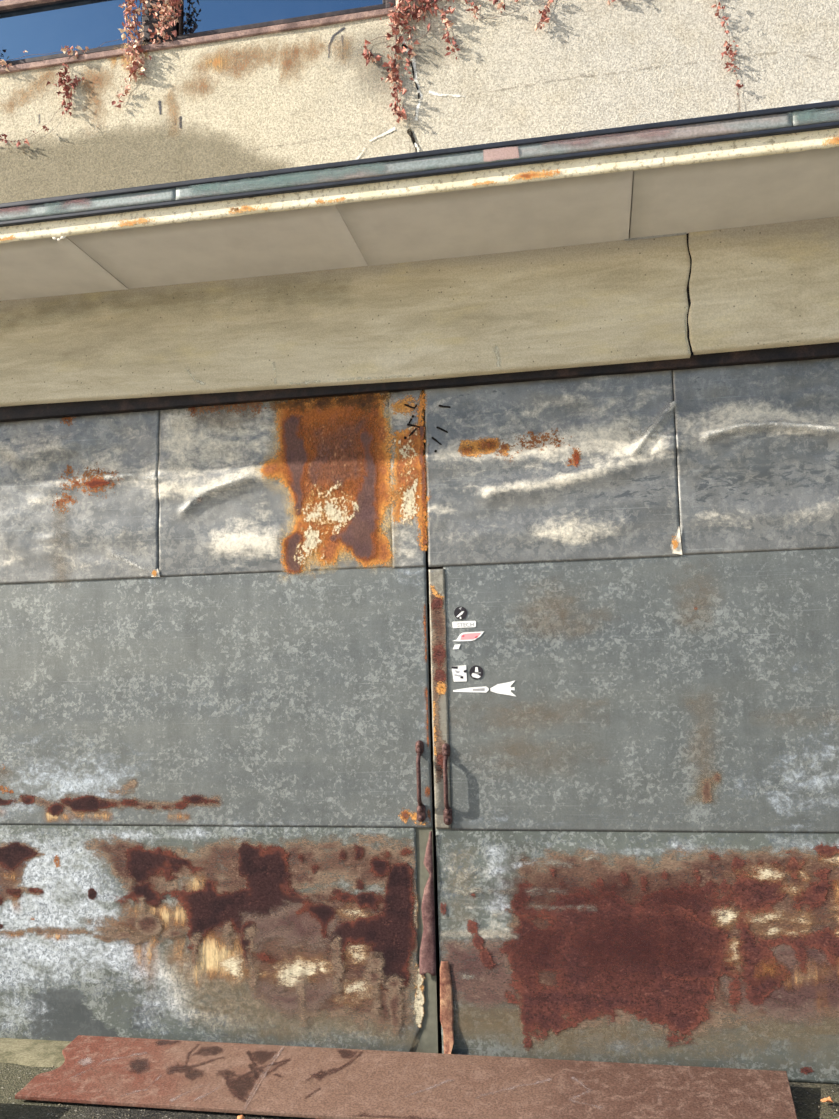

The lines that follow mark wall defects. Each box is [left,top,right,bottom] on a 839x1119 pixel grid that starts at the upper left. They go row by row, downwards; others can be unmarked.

crack [354,39,465,160]
rust [114,218,155,227]
rust [227,205,268,214]
crack [685,233,694,355]
rust [50,462,124,514]
rust [188,392,430,573]
rust [458,428,582,468]
rust [423,585,448,795]
rust [0,779,221,821]
rust [398,809,431,825]
rust [0,834,418,1034]
rust [440,843,839,1051]